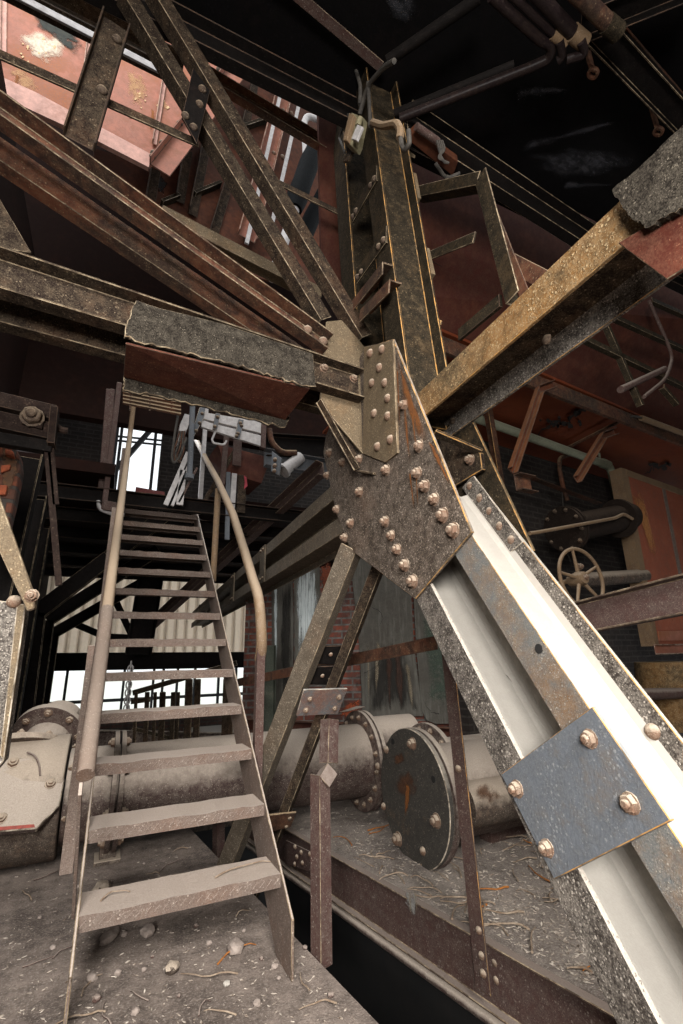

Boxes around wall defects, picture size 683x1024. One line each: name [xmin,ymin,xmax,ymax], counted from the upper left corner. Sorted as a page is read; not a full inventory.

rust [397,363,421,452]